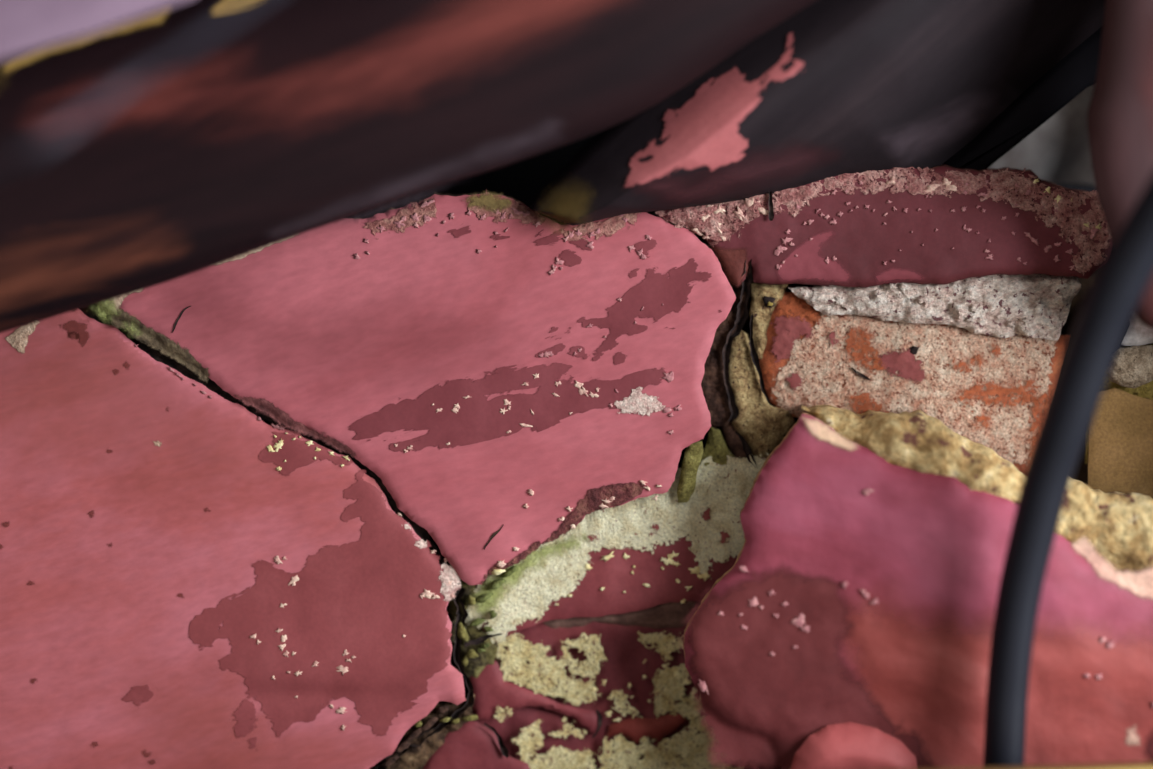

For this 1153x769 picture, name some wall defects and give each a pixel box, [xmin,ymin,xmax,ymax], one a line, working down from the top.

peeling [348,148,1110,504]
crack [722,259,772,466]
crack [80,304,518,769]
peeling [188,431,461,751]
spalling [481,480,662,583]
crack [592,710,602,738]
peeling [543,566,935,769]
spalling [1057,479,1153,599]